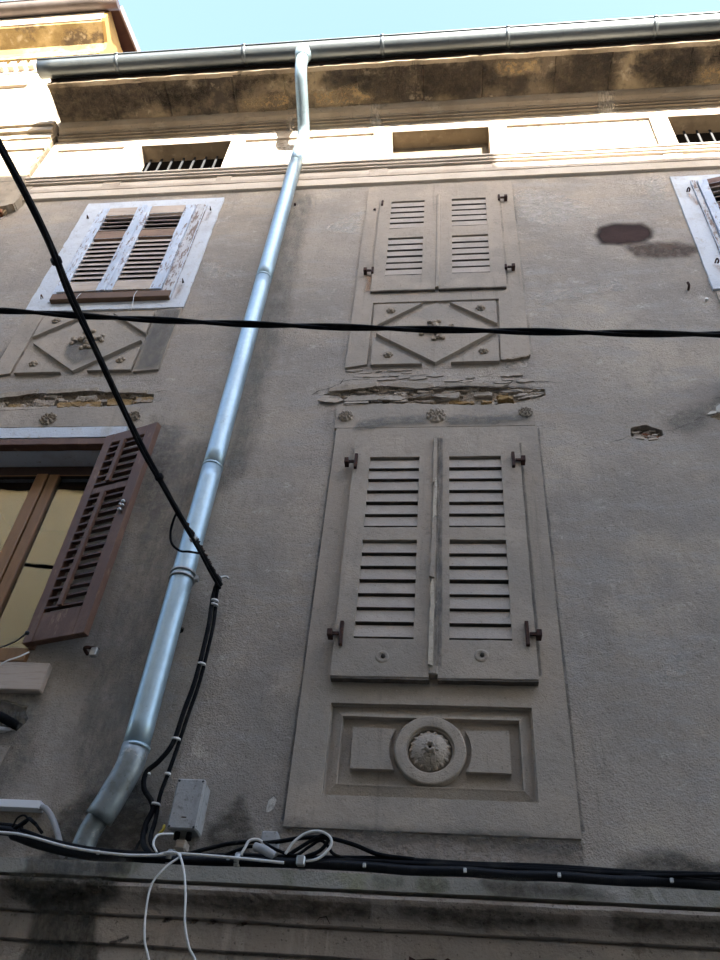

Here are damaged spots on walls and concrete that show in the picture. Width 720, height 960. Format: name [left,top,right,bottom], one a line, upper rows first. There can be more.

leakage [53,83,207,121]
flaking render [318,355,546,405]
flaking render [0,387,154,411]
spalling [631,429,661,441]
leakage [0,783,149,960]
leakage [192,895,368,917]
leakage [407,907,553,927]